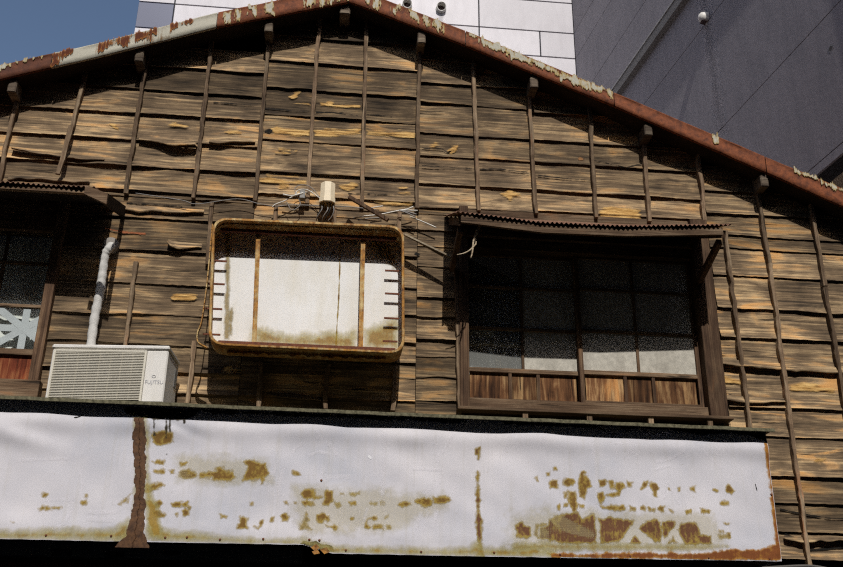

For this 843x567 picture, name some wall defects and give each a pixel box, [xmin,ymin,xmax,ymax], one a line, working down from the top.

peeling [223,0,275,24]
peeling [303,0,349,8]
peeling [365,0,444,34]
corrosion [96,27,157,53]
peeling [466,33,613,99]
corrosion [224,232,233,338]
corrosion [257,329,354,346]
corrosion [367,322,397,347]
corrosion [146,430,173,446]
corrosion [135,460,269,543]
corrosion [237,489,360,530]
corrosion [271,443,781,561]